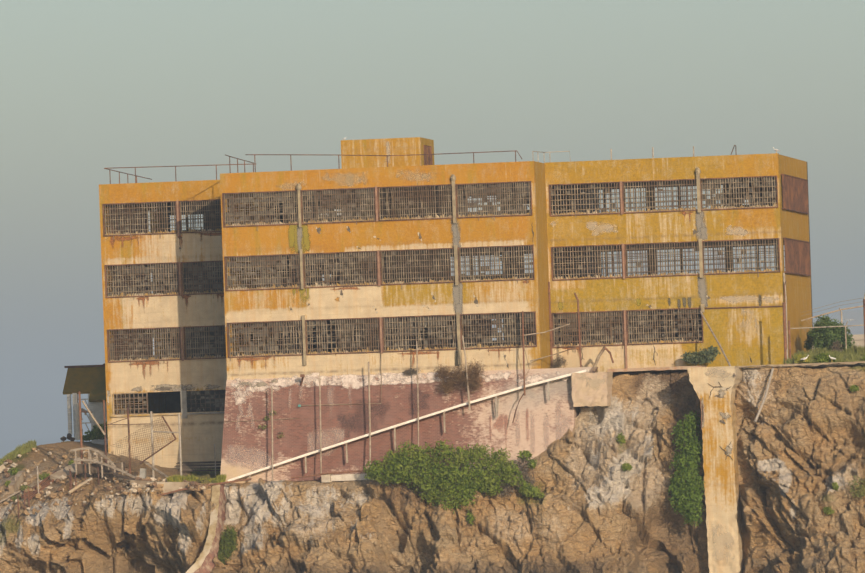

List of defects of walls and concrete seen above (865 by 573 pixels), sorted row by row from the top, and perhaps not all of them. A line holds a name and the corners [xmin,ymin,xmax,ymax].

damp [696,211,708,240]
damp [453,283,463,314]
corrosion [131,361,168,378]
peeling [231,353,572,405]